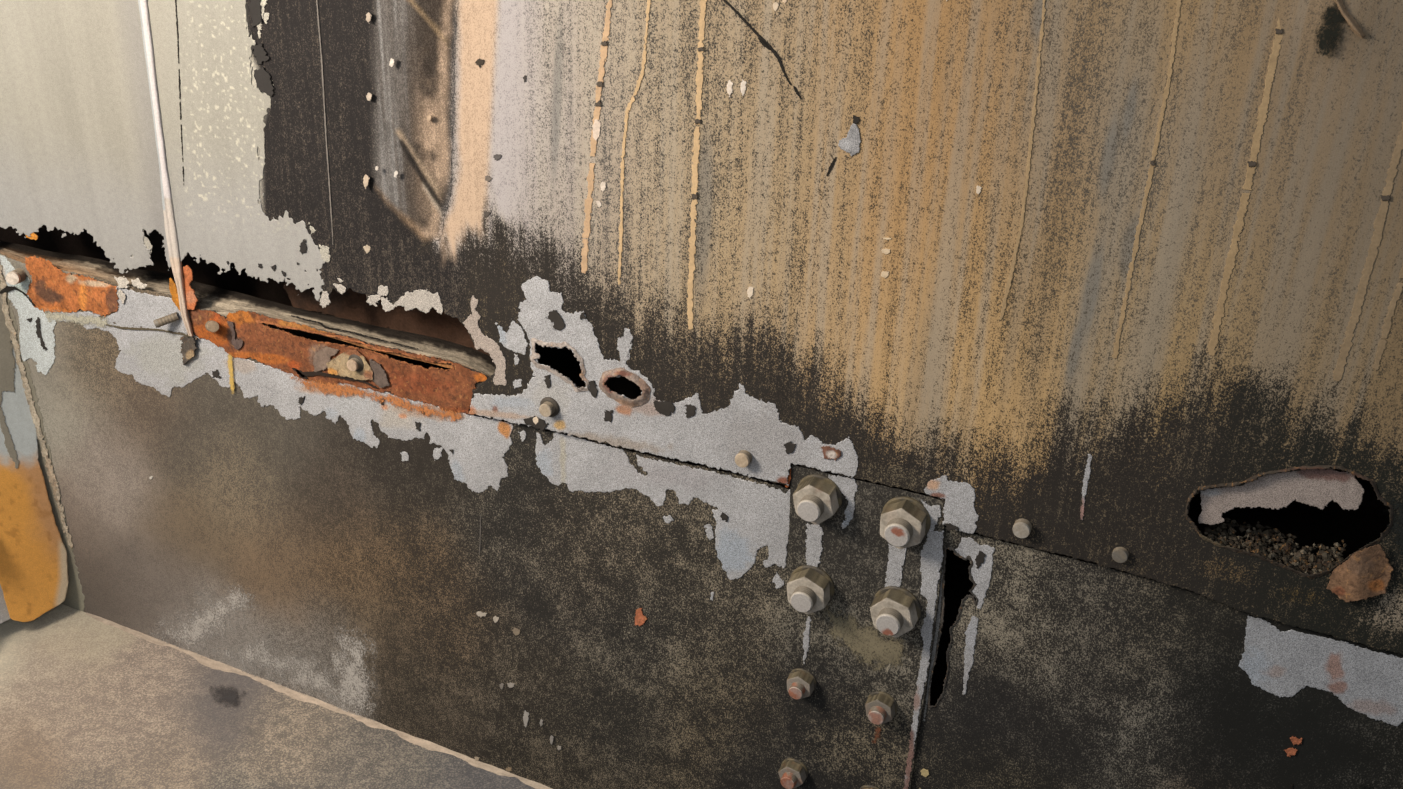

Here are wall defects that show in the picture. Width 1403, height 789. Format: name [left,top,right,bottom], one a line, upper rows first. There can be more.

corrosion [25,232,119,328]
corrosion [169,265,487,422]
peeling [0,0,1097,789]
water stain [581,0,613,273]
water stain [618,0,651,285]
water stain [686,0,707,330]
water stain [1112,0,1182,359]
water stain [1208,18,1283,356]
spalling [1188,469,1390,573]
water stain [1314,4,1350,58]
water stain [1333,122,1403,381]
peeling [1239,616,1403,726]